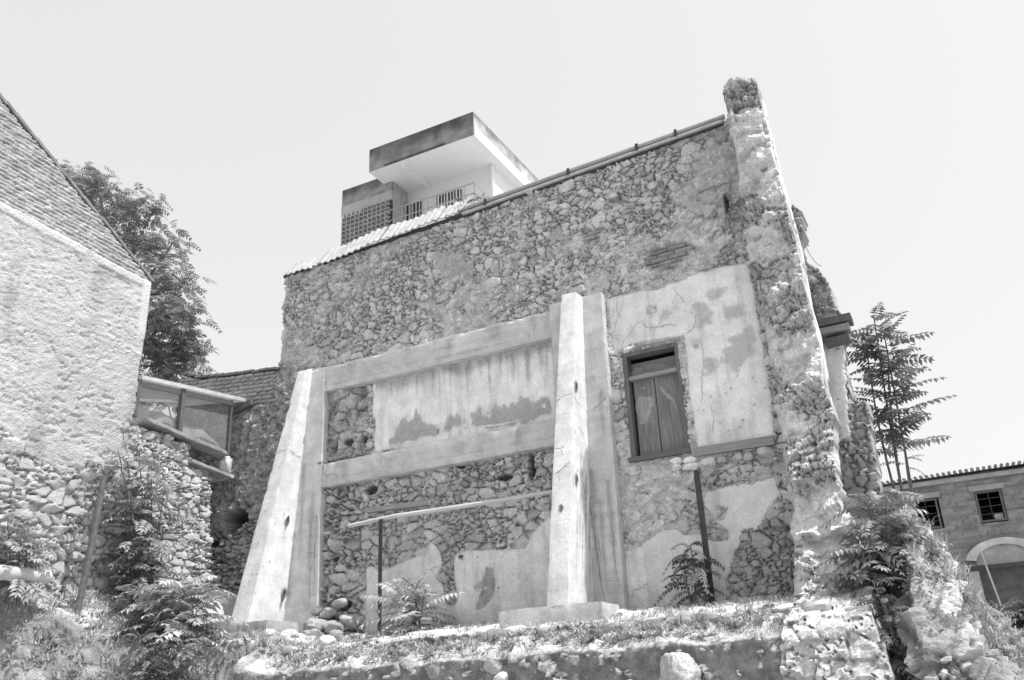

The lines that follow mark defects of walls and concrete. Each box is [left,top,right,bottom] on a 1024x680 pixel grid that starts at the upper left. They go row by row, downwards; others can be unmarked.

crack [607,287,720,434]
flaking render [474,556,499,610]